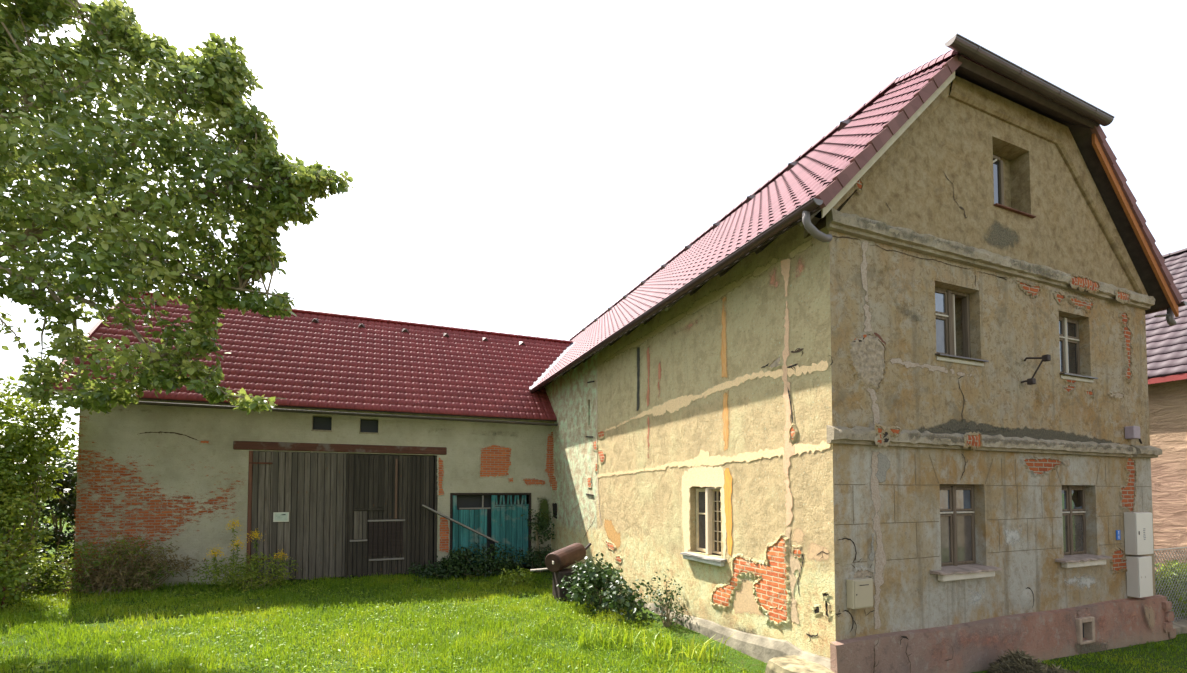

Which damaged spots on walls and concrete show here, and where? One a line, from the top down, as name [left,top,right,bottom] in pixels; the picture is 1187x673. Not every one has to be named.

spalling [1011,273,1100,314]
spalling [1115,288,1133,384]
spalling [73,410,240,582]
spalling [478,429,558,493]
spalling [1021,456,1070,478]
spalling [1119,457,1137,512]
spalling [438,515,450,554]
spalling [681,465,829,629]
spalling [1110,546,1127,574]